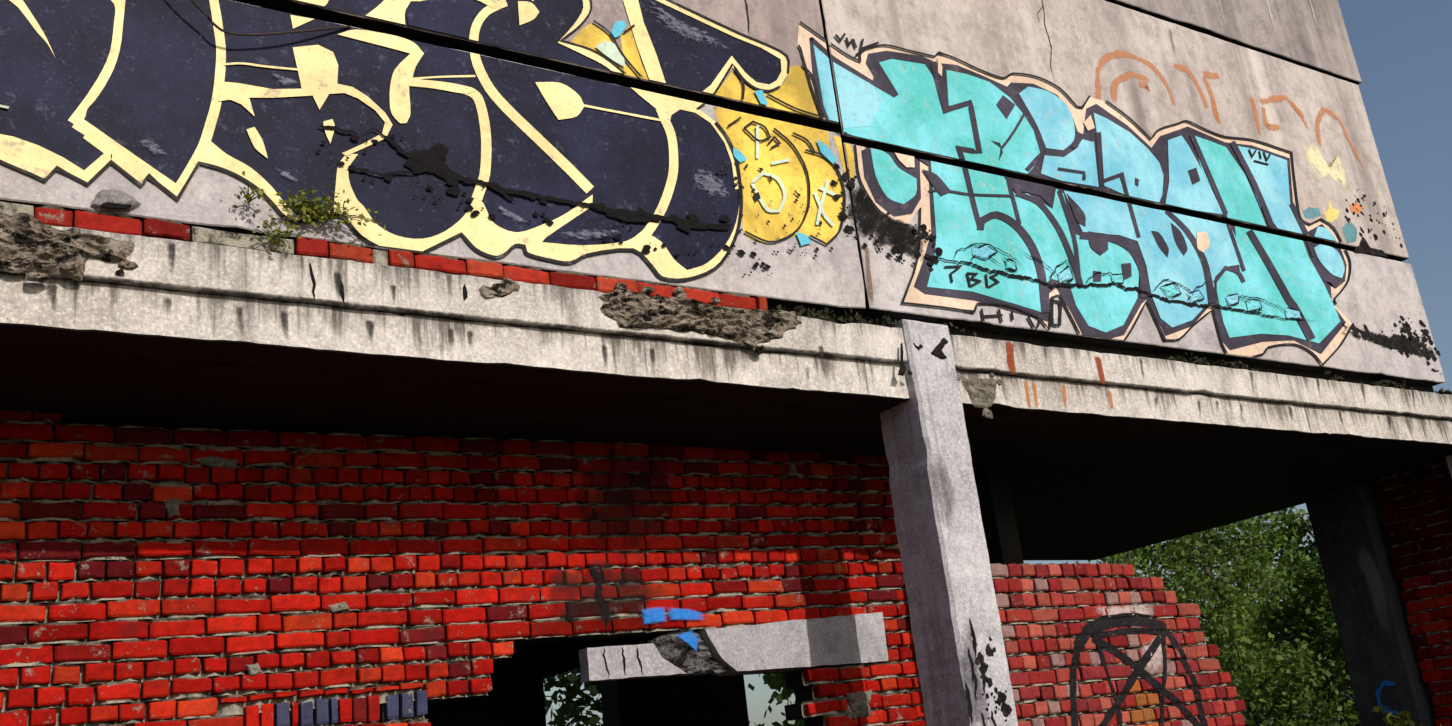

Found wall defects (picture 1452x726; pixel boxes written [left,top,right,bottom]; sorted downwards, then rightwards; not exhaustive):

spalling [0,212,139,282]
spalling [598,283,804,355]
corrosion [1006,342,1038,406]
corrosion [1095,357,1113,408]